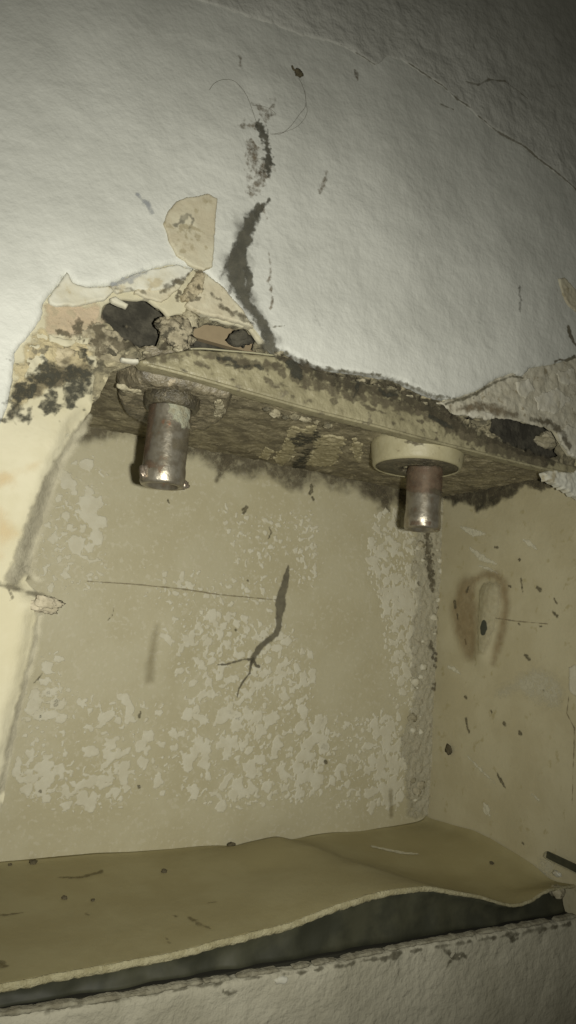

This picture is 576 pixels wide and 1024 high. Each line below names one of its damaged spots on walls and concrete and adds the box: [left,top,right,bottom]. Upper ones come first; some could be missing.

leakage [0,346,94,422]
leakage [81,426,117,440]
leakage [116,384,142,395]
leakage [213,399,226,418]
peeling [6,194,576,596]
leakage [187,431,407,509]
crack [88,566,289,697]
peeling [0,503,424,815]
leakage [402,478,552,817]